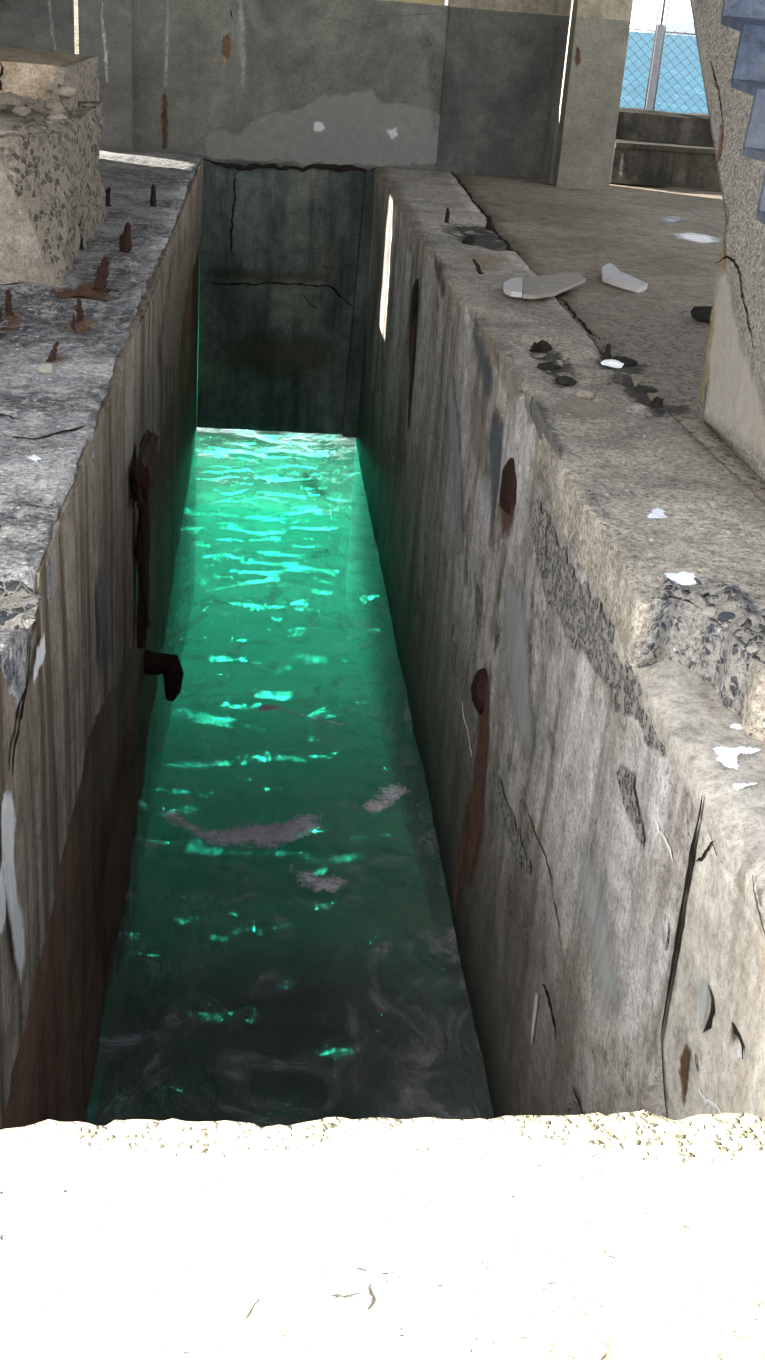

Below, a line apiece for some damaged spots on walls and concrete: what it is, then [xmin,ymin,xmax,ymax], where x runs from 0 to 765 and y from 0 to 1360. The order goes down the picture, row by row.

corrosion [159,94,168,149]
corrosion [50,282,109,301]
corrosion [495,481,515,600]
spalling [0,581,42,630]
spalling [641,571,765,664]
corrosion [453,675,489,902]
crack [660,795,765,1041]
crack [698,1089,721,1113]